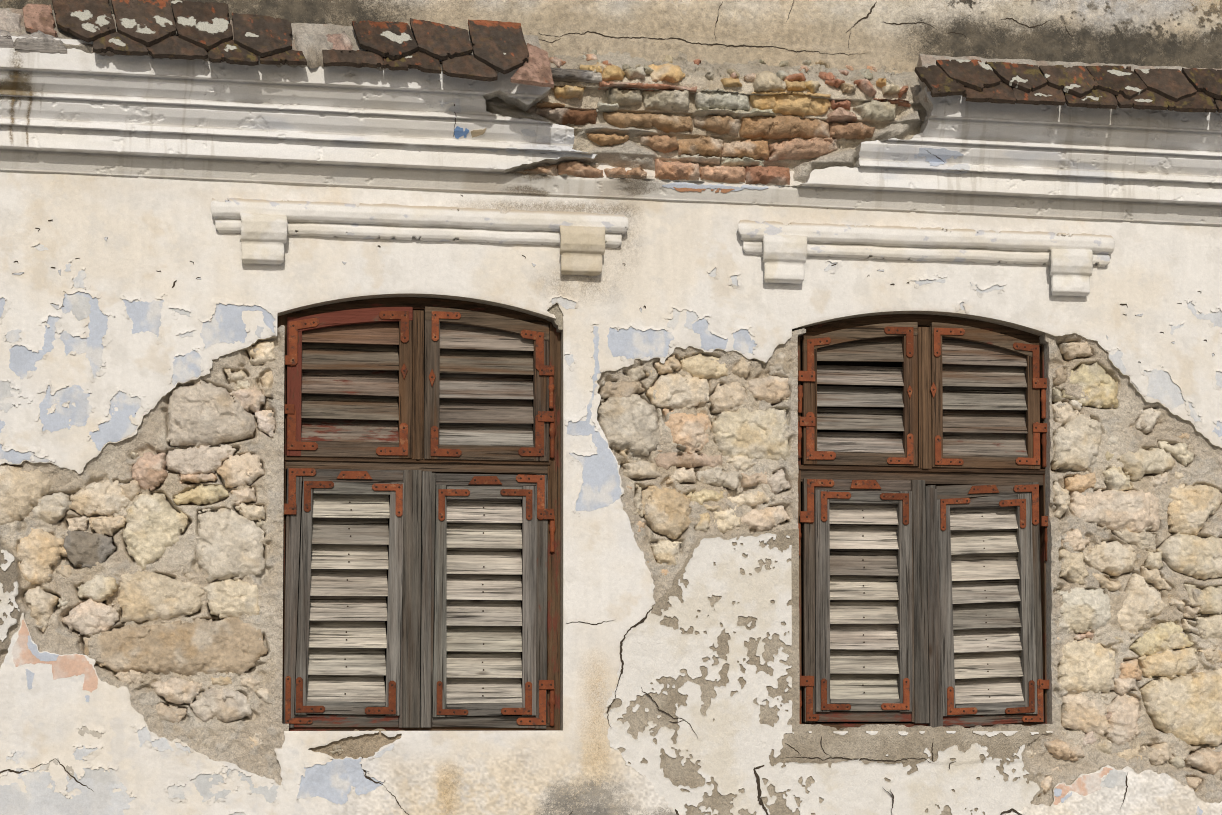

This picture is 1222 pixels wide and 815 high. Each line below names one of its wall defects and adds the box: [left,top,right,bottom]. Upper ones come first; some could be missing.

crack [539,2,966,55]
water stain [910,0,1222,69]
water stain [0,51,35,144]
spalling [439,50,970,193]
peeling [546,293,579,332]
peeling [955,278,1008,313]
spalling [0,258,405,815]
spalling [564,291,1222,815]
crack [566,607,698,738]
crack [0,759,94,792]
crack [361,757,409,815]
water stain [536,780,676,815]